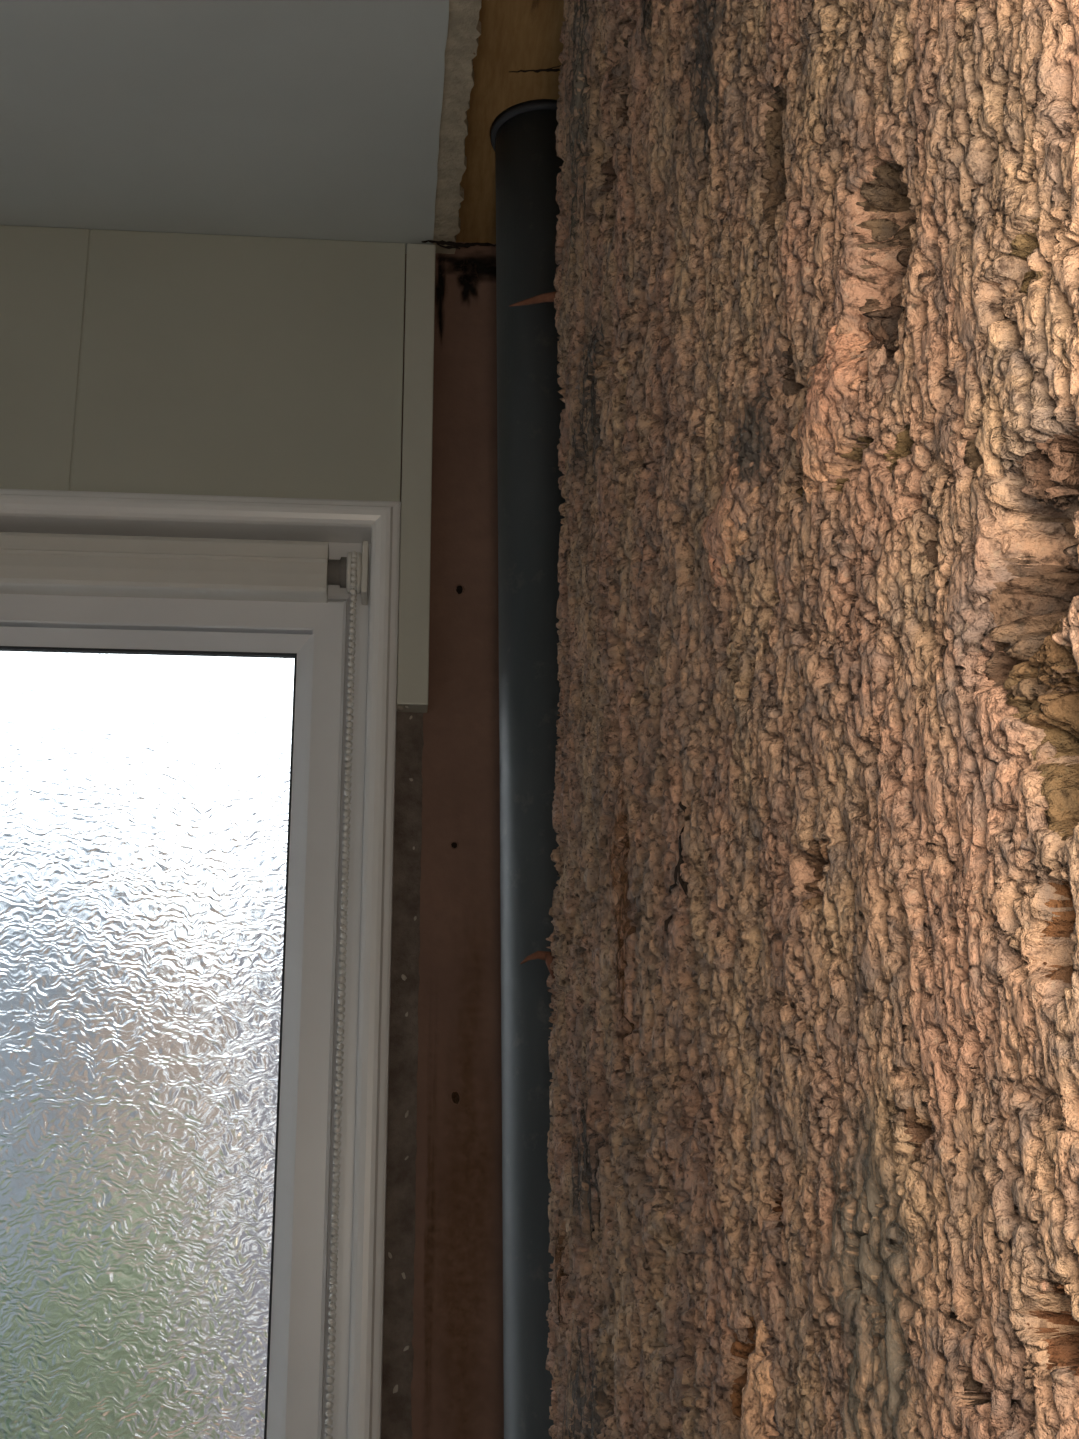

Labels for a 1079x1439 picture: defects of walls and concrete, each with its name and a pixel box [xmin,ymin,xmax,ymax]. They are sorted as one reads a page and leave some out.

crack [664,801,691,931]